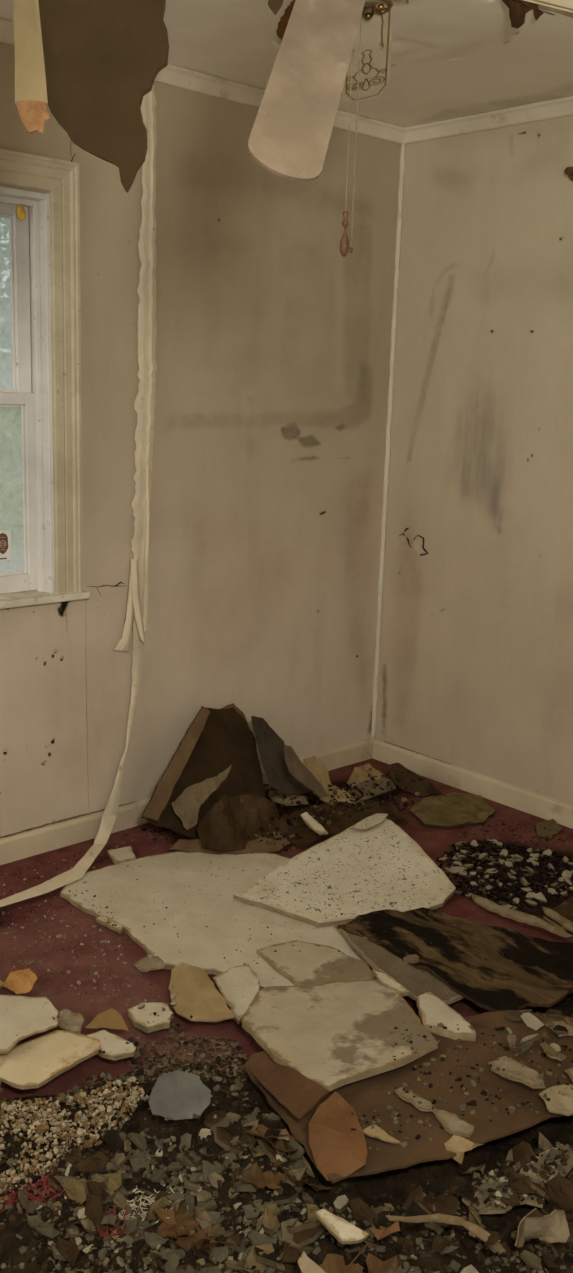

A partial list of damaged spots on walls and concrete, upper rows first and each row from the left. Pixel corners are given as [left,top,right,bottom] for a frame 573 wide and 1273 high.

peeling [272,0,296,51]